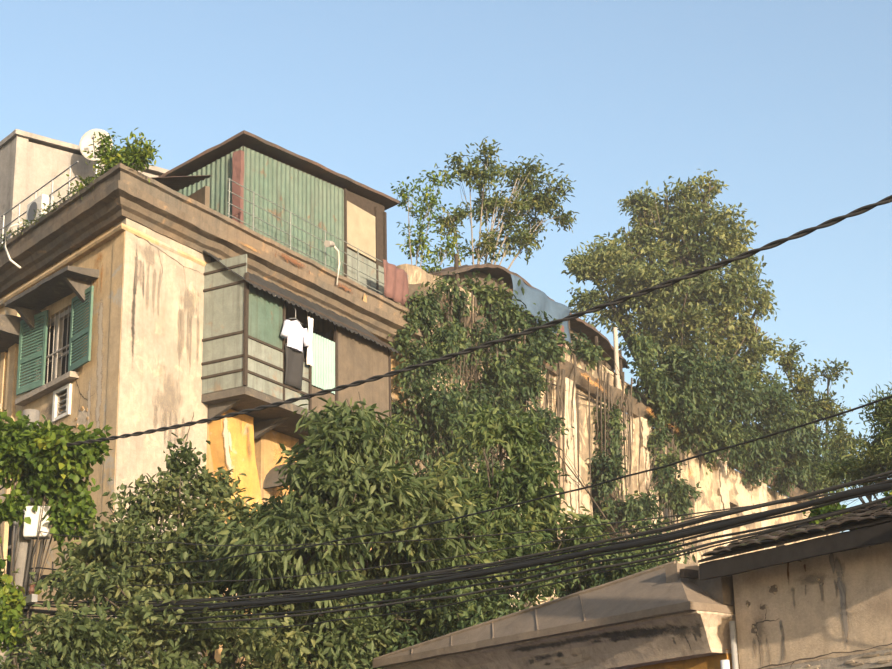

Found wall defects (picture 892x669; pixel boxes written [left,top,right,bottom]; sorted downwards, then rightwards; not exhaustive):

water stain [131,248,161,353]
water stain [178,291,199,365]
water stain [829,554,848,640]
water stain [513,624,701,665]